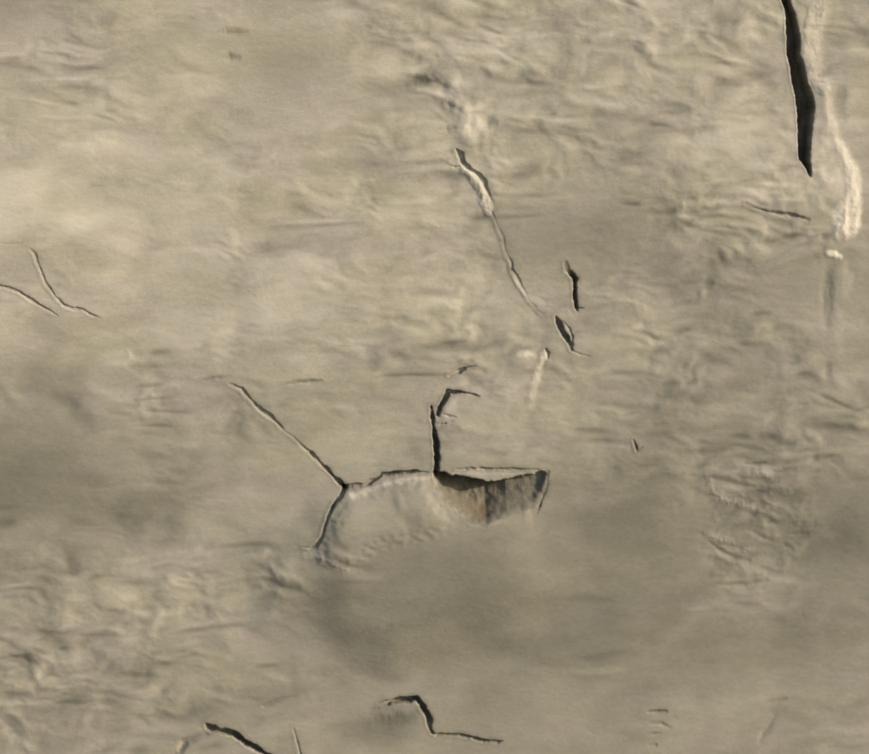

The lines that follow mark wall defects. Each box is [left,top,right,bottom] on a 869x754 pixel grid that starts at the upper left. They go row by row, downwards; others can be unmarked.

crack [779,0,831,180]
crack [0,238,104,321]
crack [444,145,595,360]
crack [194,362,482,552]
peeling [301,465,552,576]
crack [170,720,274,754]
crack [290,725,305,754]
crack [370,692,506,747]